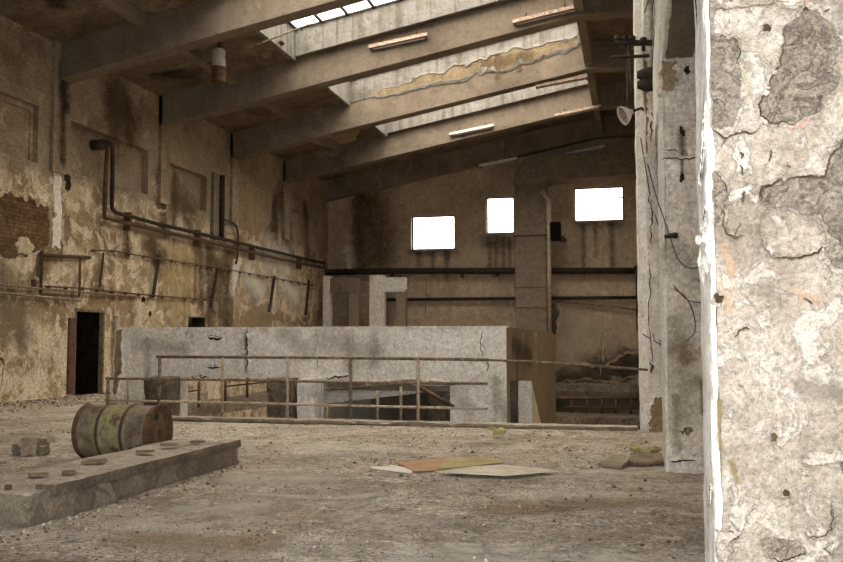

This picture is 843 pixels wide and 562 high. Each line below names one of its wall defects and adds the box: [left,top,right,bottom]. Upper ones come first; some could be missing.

spalling [709,0,843,135]
spalling [0,172,97,266]
spalling [757,129,843,276]
crack [769,496,837,562]